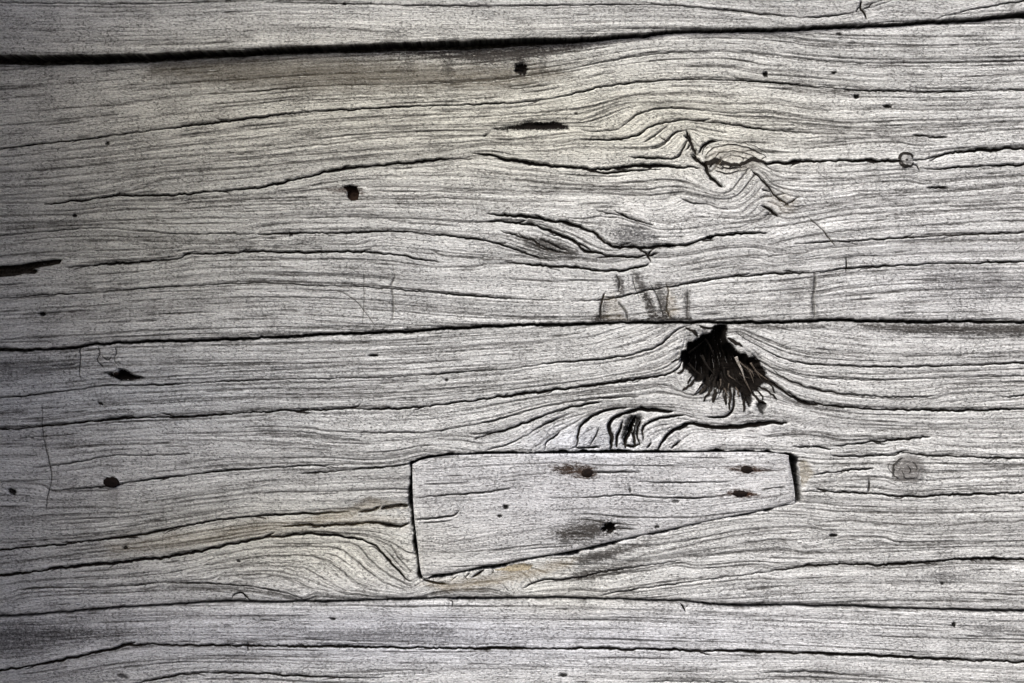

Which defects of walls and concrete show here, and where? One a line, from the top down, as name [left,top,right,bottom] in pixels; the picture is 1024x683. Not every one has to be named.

crack [44,107,805,205]
crack [0,135,1024,301]
crack [0,323,1024,508]
rust [550,461,598,480]
crack [0,488,509,606]
crack [524,557,1024,611]